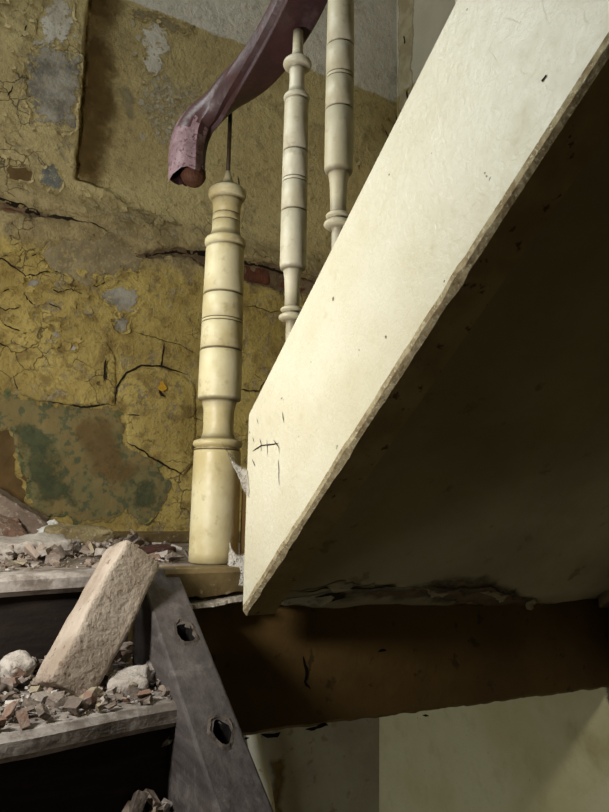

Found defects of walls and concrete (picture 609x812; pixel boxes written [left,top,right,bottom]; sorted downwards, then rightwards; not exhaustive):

peeling [129,8,197,77]
peeling [0,0,84,137]
peeling [1,153,64,196]
flaking render [0,191,88,223]
flaking render [136,244,206,269]
flaking render [244,254,285,293]
flaking render [300,277,316,295]
peeling [96,282,146,335]
water stain [15,425,76,506]
peeling [281,580,511,607]